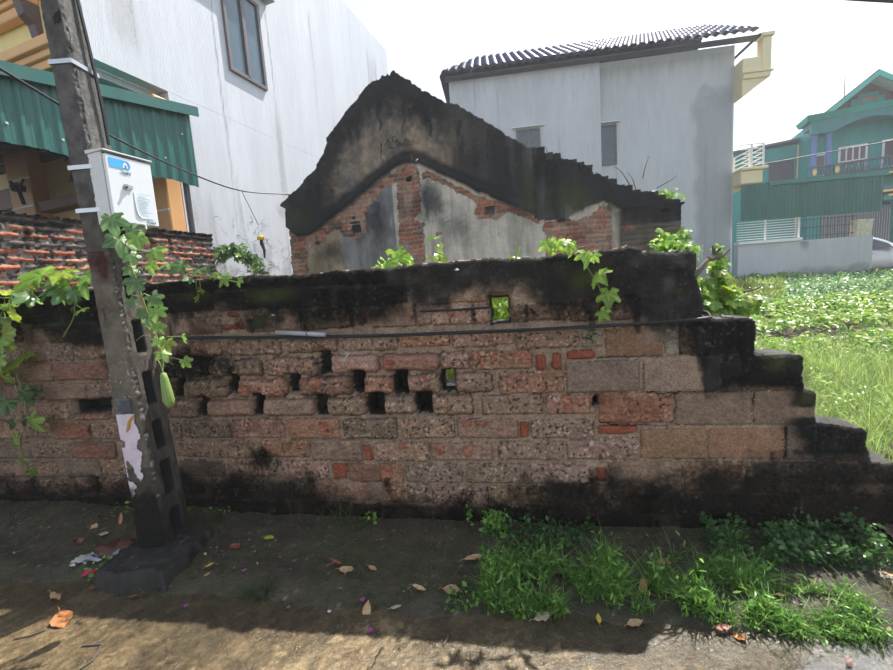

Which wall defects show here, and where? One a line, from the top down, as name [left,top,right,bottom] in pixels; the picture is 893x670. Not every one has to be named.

peeling [289,165,637,275]
leakage [0,288,104,347]
leakage [142,70,893,533]
leakage [0,470,166,549]